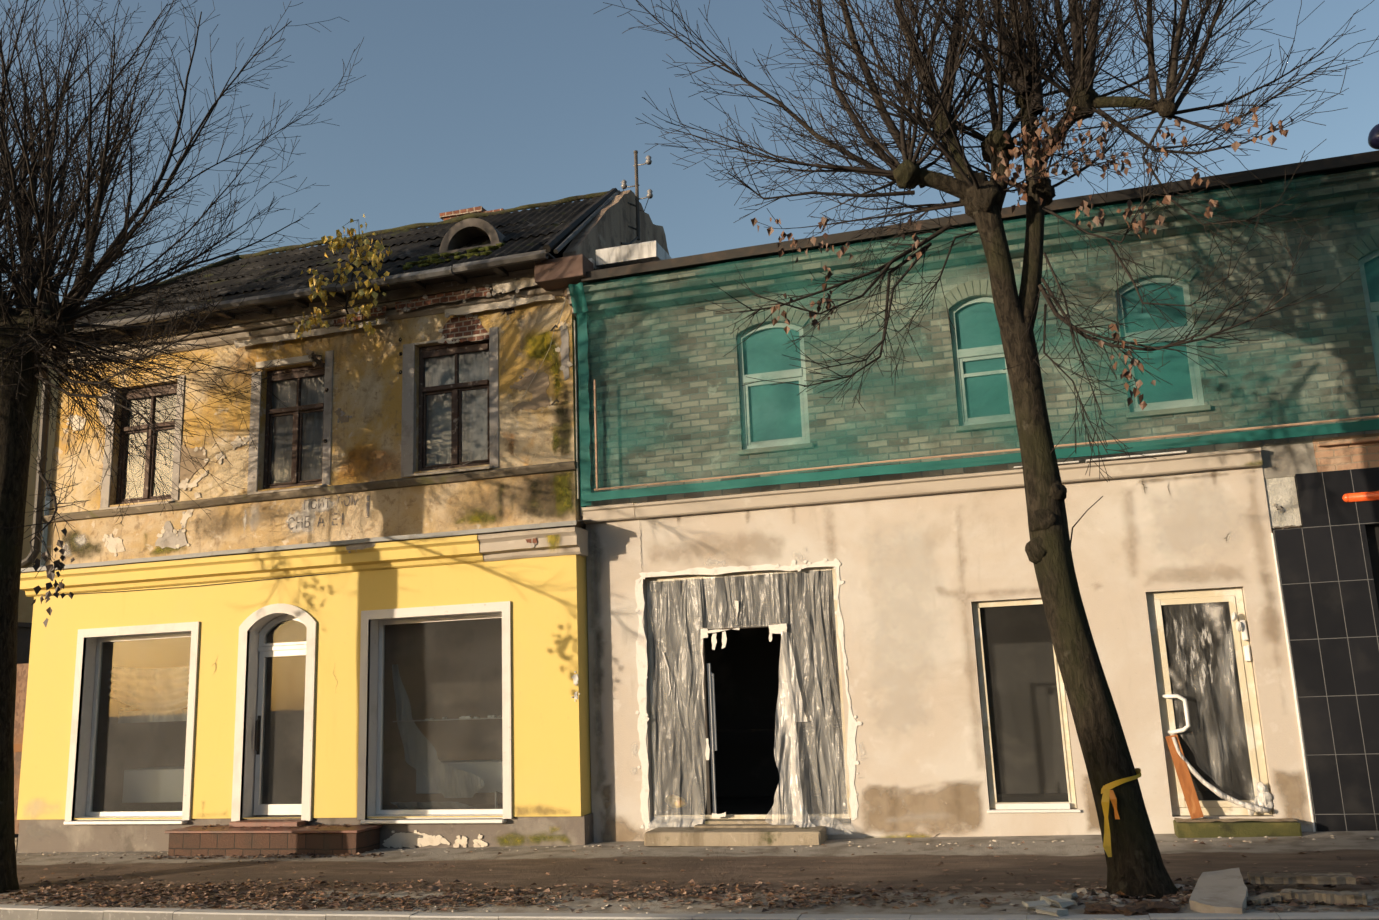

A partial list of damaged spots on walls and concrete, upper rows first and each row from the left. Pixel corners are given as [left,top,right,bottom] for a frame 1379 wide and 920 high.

flaking render [438,277,555,344]
peeling [509,325,573,412]
water stain [535,333,571,454]
flaking render [155,436,250,549]
water stain [523,471,573,516]
flaking render [382,830,488,848]